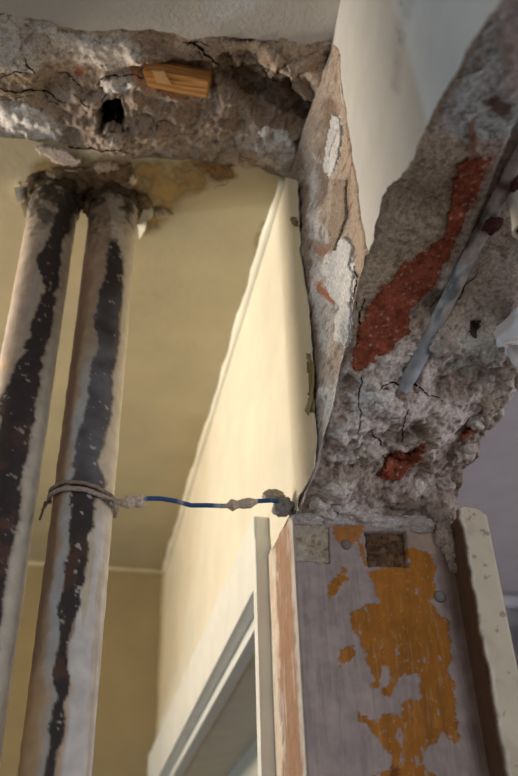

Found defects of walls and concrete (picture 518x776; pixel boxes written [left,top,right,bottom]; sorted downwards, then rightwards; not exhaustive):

crack [0,57,143,108]
crack [183,41,220,67]
damp [36,159,235,228]
spalling [0,0,518,574]
crack [353,266,365,345]
crack [353,368,385,459]
crack [381,381,441,399]